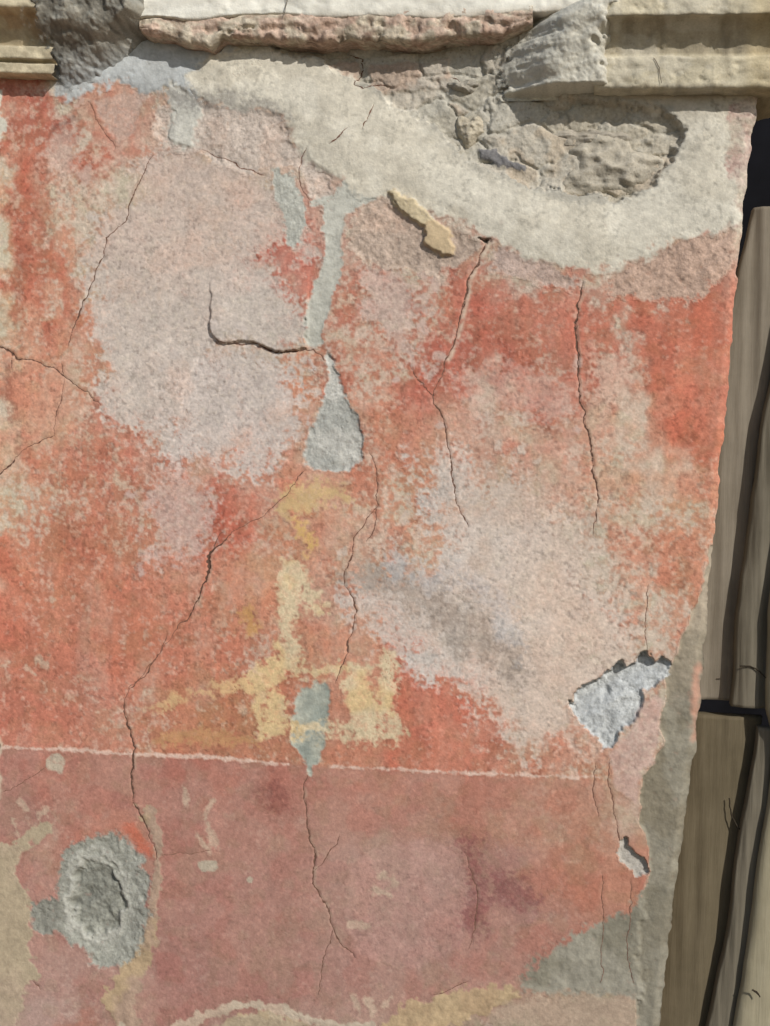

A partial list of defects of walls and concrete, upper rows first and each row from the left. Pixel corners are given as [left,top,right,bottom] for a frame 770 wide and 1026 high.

flaking render [292,40,688,204]
crack [0,157,152,474]
crack [123,471,304,862]
crack [217,340,326,361]
crack [335,452,379,684]
crack [409,244,486,527]
peeling [328,185,672,774]
crack [574,284,600,534]
flaking render [606,229,740,309]
crack [303,776,355,994]